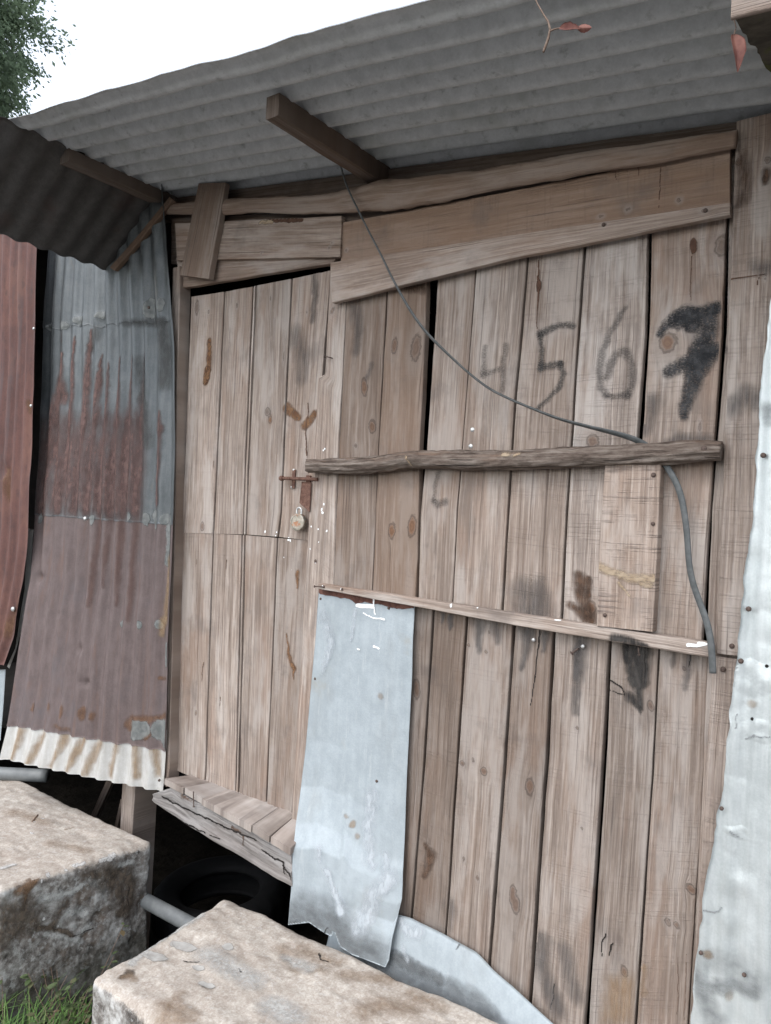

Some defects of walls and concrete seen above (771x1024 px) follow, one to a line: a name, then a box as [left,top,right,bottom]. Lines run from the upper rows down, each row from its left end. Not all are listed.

corrosion [37,329,144,515]
water stain [568,572,596,624]
water stain [610,634,650,713]
corrosion [50,734,101,773]
corrosion [125,713,166,778]
crack [162,796,291,880]